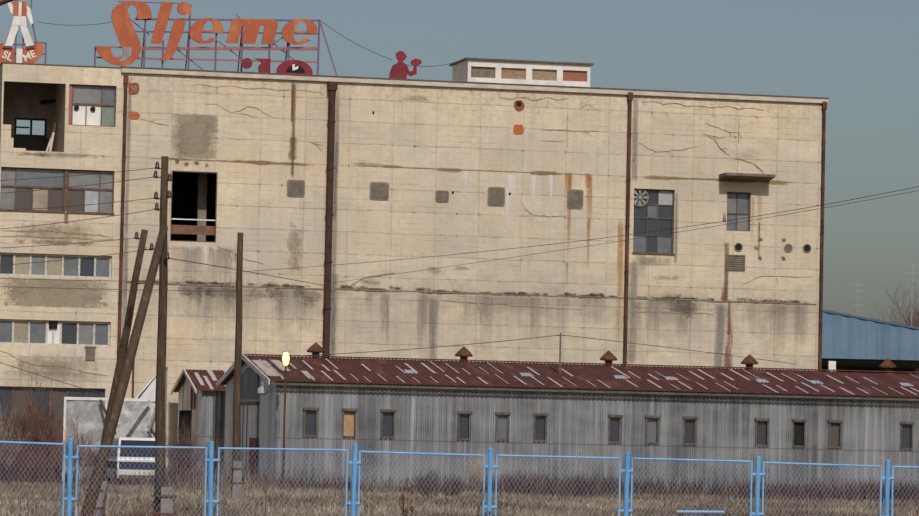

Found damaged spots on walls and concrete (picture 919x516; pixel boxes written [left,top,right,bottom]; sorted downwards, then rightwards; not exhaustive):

corrosion [171,85,306,176]
crack [199,84,312,118]
crack [642,101,764,174]
damp [259,343,386,382]
damp [396,288,576,387]
corrosion [718,244,732,367]